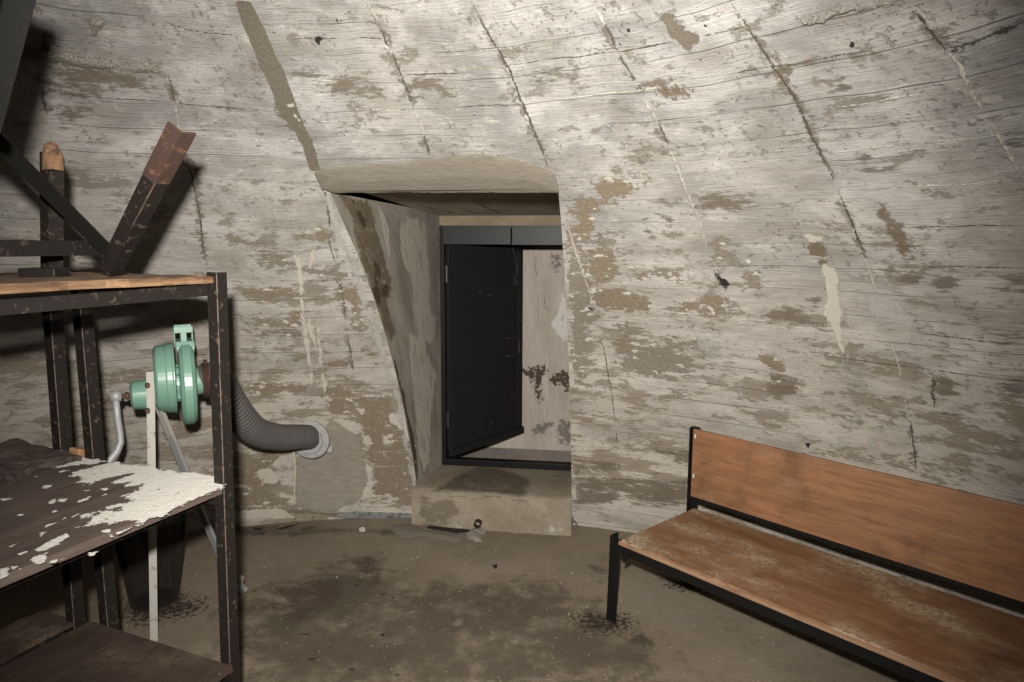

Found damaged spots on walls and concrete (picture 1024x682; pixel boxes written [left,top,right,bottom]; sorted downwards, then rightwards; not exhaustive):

crack [950,22,1023,48]
crack [729,51,866,75]
crack [838,190,866,258]
crack [909,421,917,470]